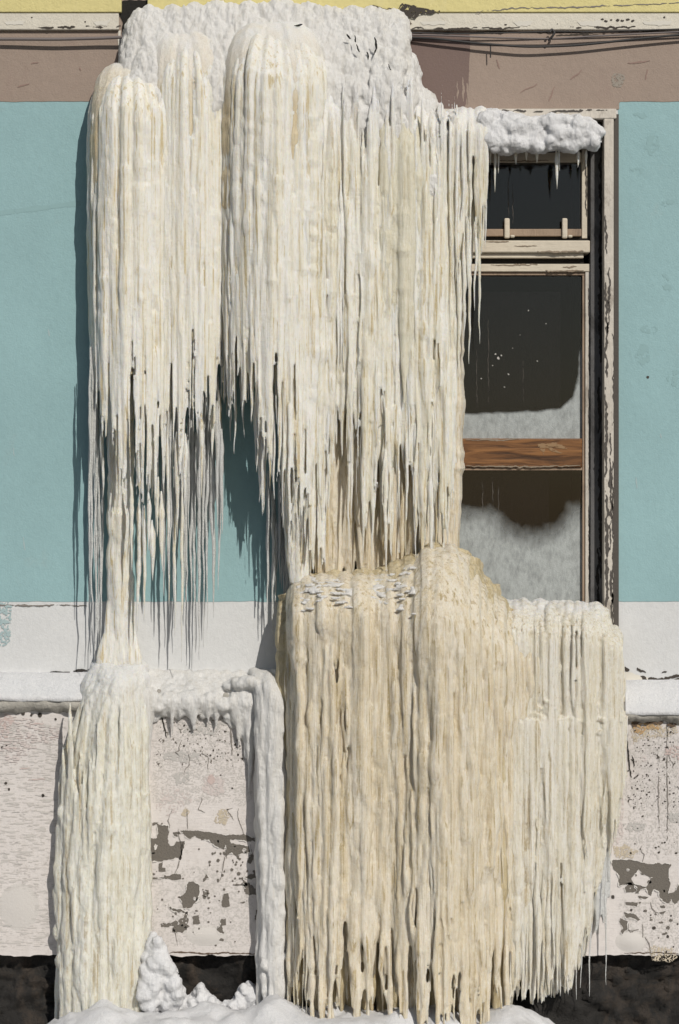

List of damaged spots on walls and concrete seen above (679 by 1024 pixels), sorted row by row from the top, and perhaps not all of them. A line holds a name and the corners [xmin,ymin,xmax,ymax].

peeling [373,3,533,31]
peeling [557,16,672,30]
peeling [607,267,616,625]
peeling [151,822,257,953]
peeling [610,725,679,959]